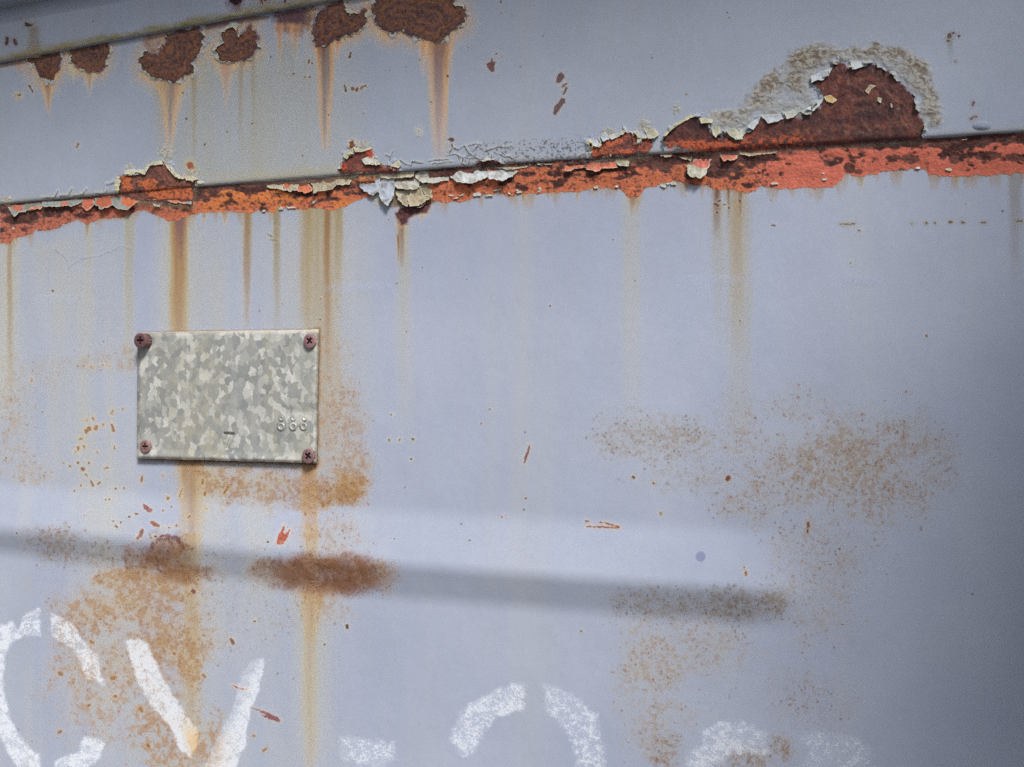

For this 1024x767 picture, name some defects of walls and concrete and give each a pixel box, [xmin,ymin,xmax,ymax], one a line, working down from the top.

rust [0,42,113,96]
rust [138,0,470,120]
peeling [467,139,604,167]
rust [388,56,1024,242]
peeling [359,170,449,208]
rust [0,140,402,333]
rust [178,449,368,518]
rust [778,432,913,502]
rust [252,528,385,618]
rust [63,535,211,689]
rust [130,702,222,767]